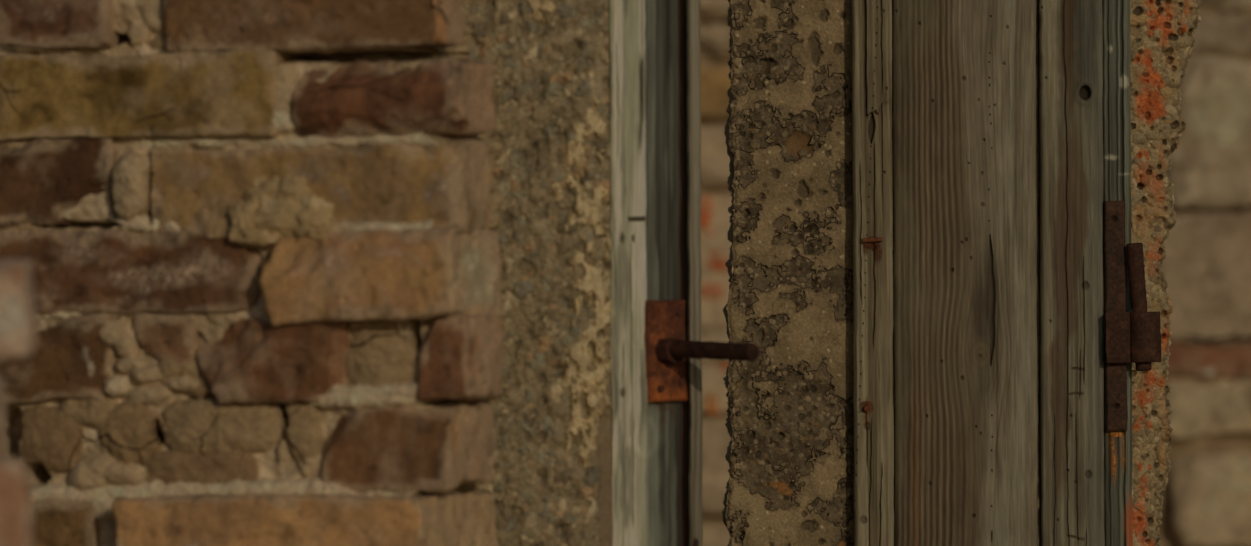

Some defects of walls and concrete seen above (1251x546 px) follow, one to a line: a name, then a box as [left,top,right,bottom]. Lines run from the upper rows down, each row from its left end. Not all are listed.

spalling [701,0,854,546]